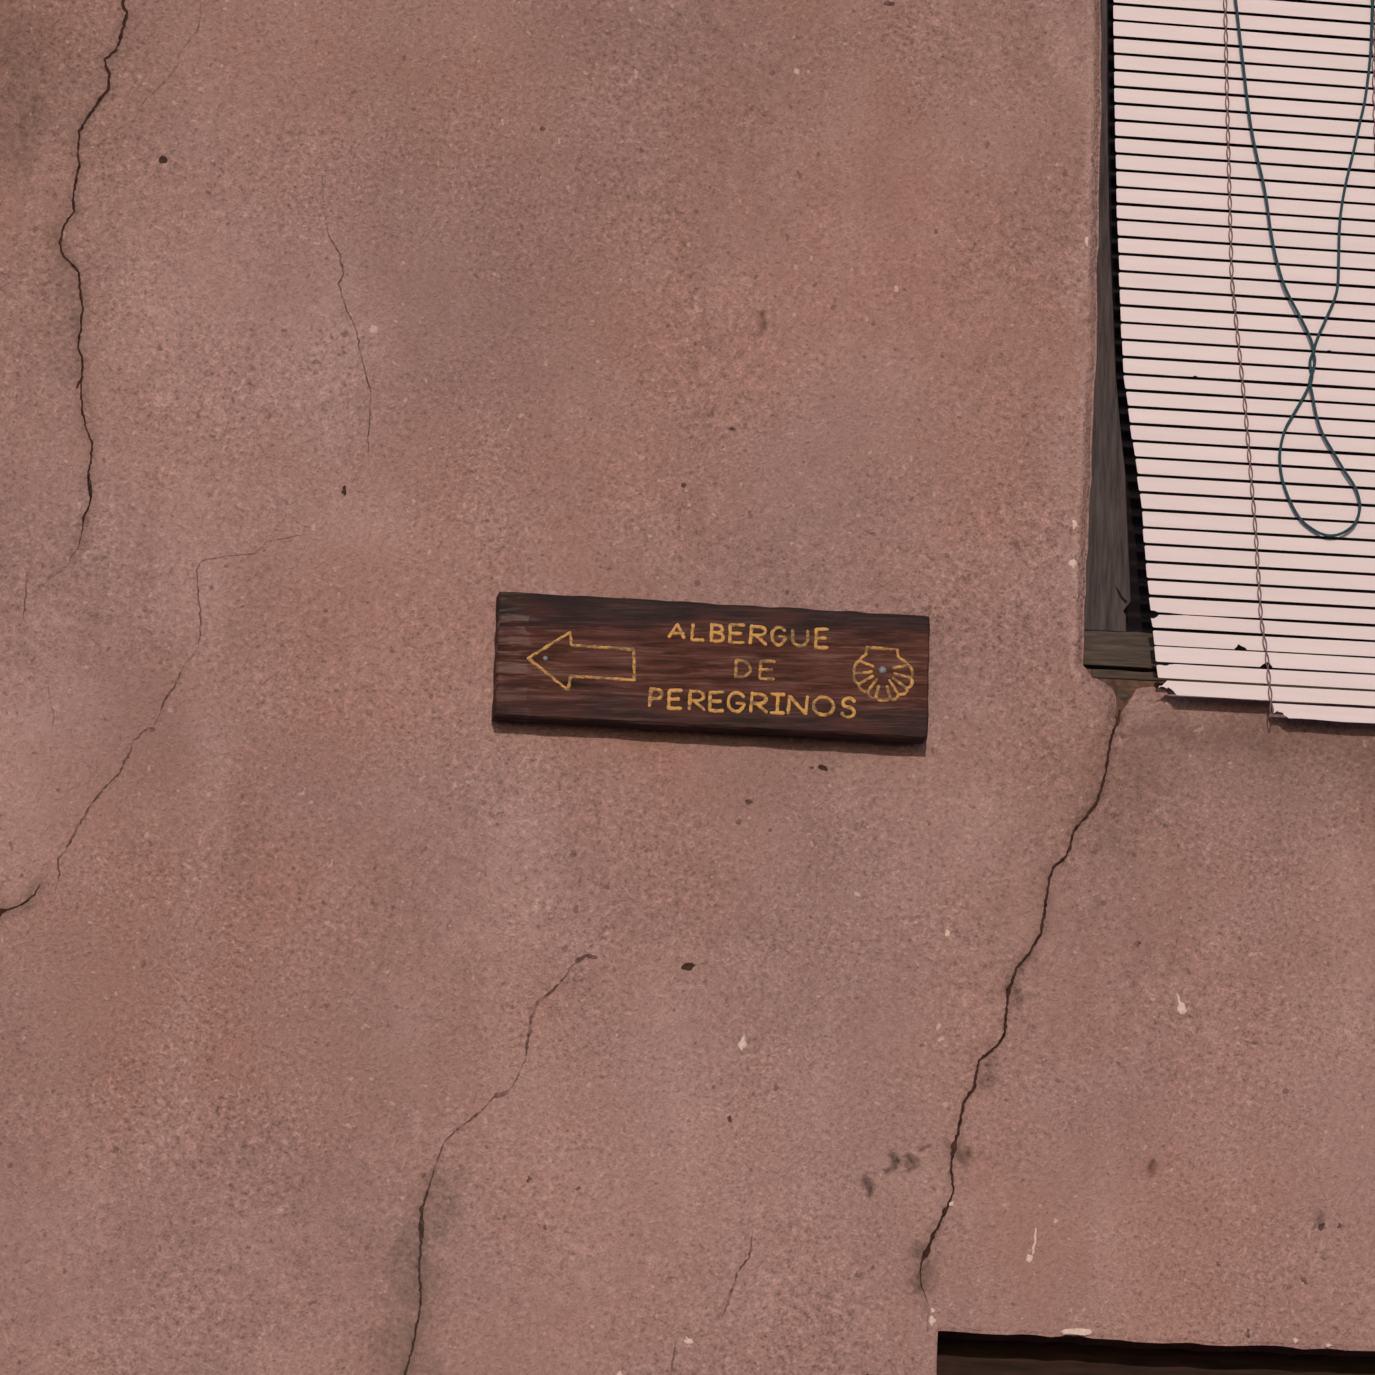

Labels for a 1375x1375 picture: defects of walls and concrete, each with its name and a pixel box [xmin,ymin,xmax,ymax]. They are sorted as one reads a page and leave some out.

crack [58,0,128,565]
crack [0,672,180,917]
crack [196,536,294,640]
crack [404,954,597,1375]
crack [919,709,1122,1302]